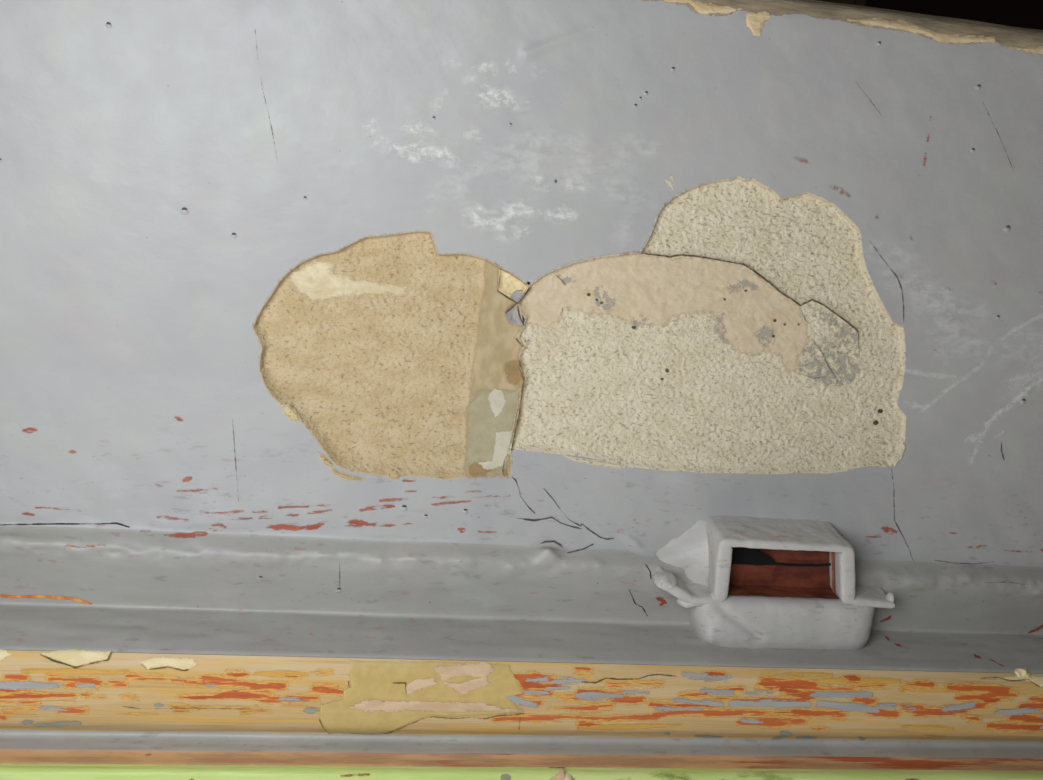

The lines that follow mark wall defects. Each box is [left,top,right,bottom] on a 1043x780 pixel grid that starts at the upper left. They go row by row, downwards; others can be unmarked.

peeling [641,0,1043,55]
peeling [253,176,906,481]
crack [512,477,614,553]
peeling [0,649,1043,740]